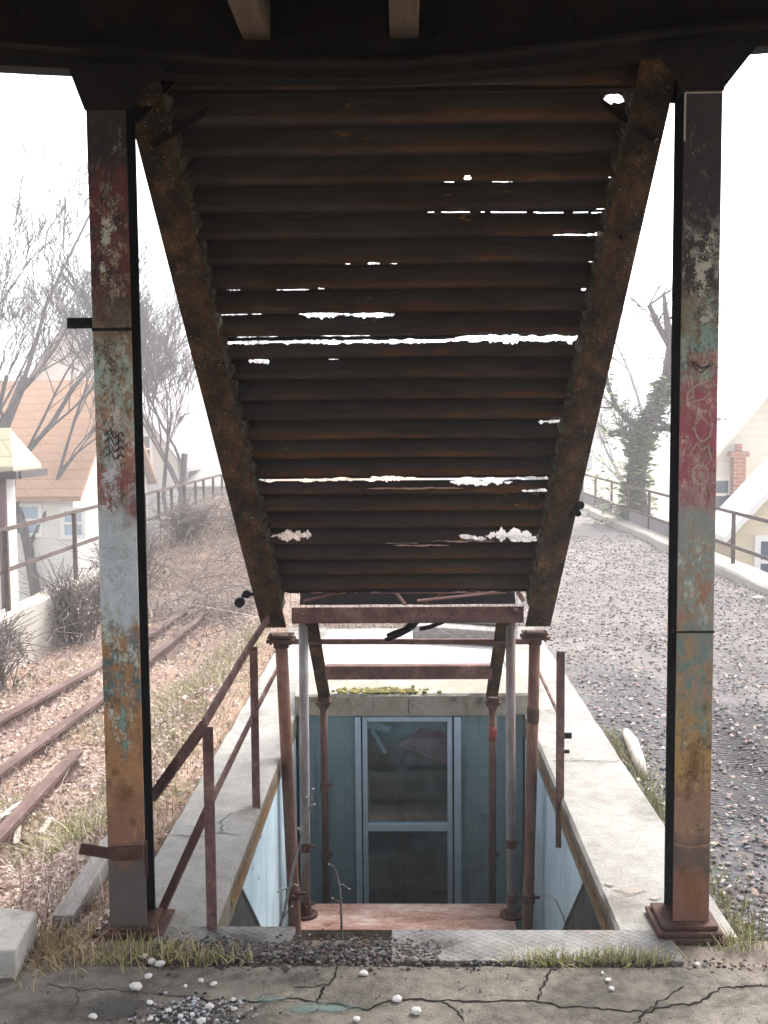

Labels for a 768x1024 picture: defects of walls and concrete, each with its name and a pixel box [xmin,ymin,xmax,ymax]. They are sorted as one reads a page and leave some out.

peeling [99,214,117,288]
peeling [693,232,716,325]
rust [232,774,280,907]
crack [46,965,768,1024]